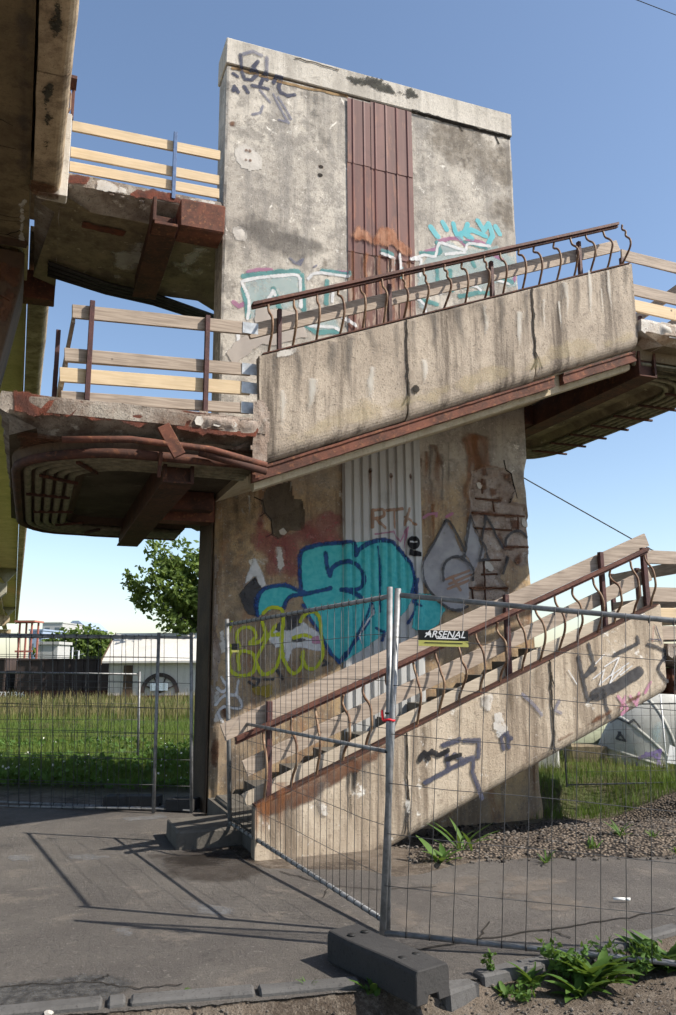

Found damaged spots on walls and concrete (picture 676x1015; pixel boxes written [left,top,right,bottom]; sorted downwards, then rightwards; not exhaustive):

leakage [347,76,418,98]
crack [411,109,511,144]
peeling [97,180,152,205]
corrosion [354,226,412,291]
crack [402,320,410,406]
crack [531,288,543,370]
spalling [261,481,305,569]
corrosion [258,745,386,816]